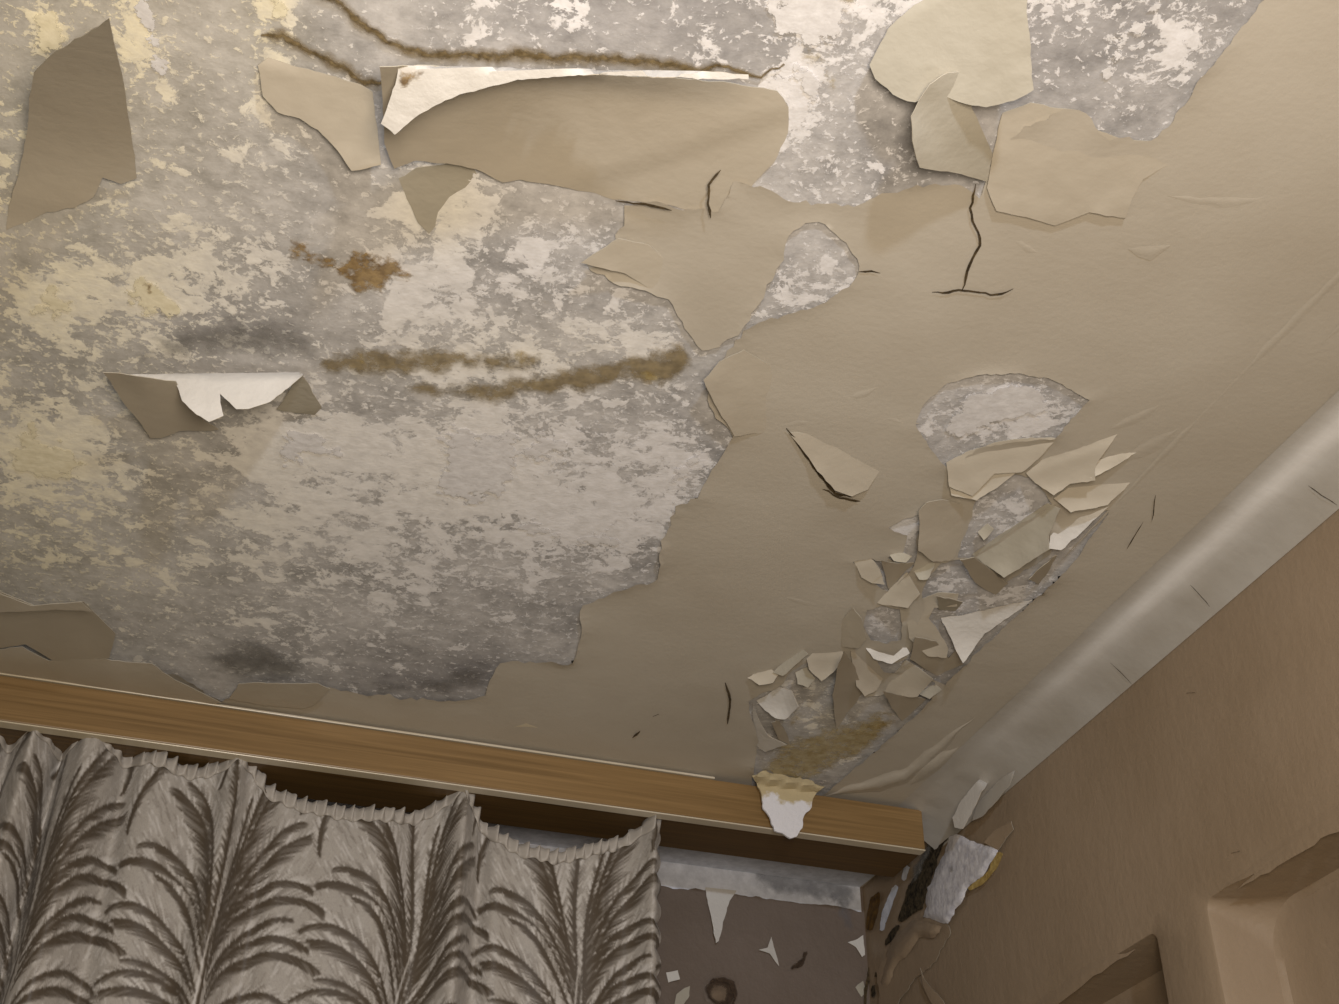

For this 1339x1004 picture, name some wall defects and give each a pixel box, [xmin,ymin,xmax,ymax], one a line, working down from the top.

crack [261,30,381,85]
crack [329,0,785,79]
crack [937,184,1012,296]
damp [323,345,689,401]
peeling [0,0,1263,702]
peeling [748,373,1135,796]
peeling [848,935,865,957]
flaking render [871,821,1014,997]